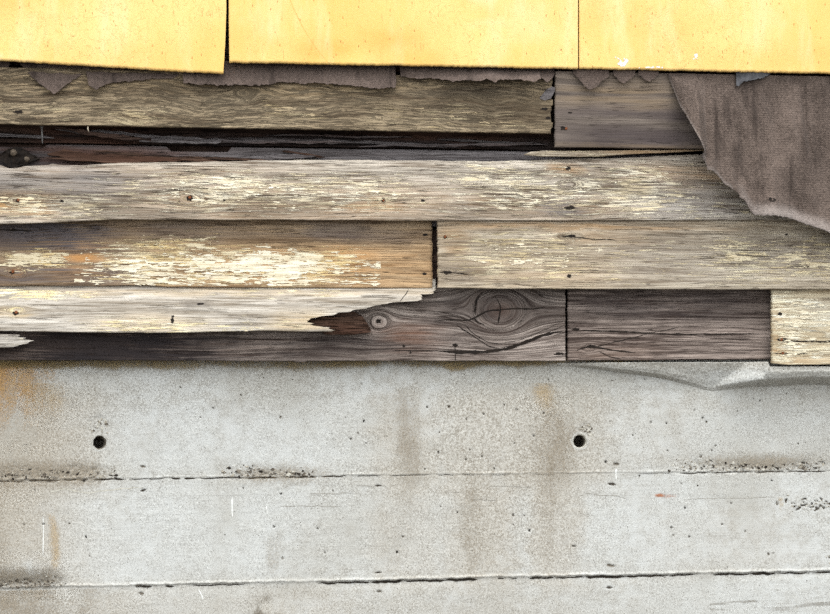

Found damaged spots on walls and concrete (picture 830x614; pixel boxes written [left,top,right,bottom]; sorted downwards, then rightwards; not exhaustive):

peeling [736,72,770,86]
peeling [482,167,668,210]
peeling [0,235,381,300]
peeling [707,235,830,279]